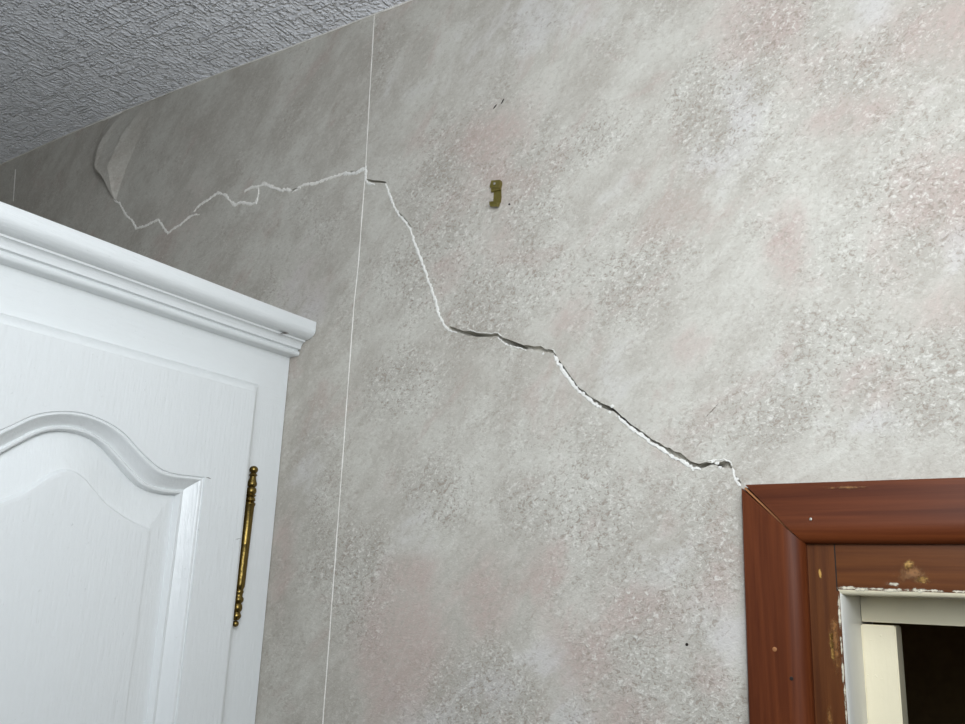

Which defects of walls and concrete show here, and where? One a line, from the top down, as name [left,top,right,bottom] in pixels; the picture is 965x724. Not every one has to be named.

crack [113,166,741,486]